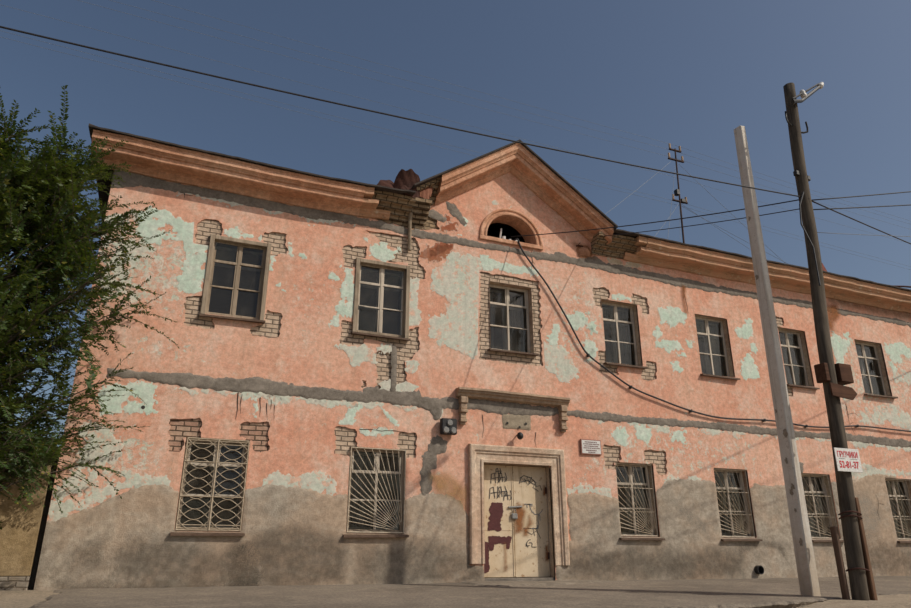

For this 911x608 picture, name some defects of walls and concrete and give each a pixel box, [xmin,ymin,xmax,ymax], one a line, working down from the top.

peeling [94,206,307,329]
peeling [328,214,695,392]
flaking render [250,310,282,338]
peeling [831,331,854,364]
peeling [884,341,911,386]
peeling [859,404,911,431]
peeling [48,380,427,522]
peeling [603,422,709,483]
peeling [698,428,831,442]
peeling [850,441,911,453]
peeling [851,463,911,480]
peeling [567,482,612,498]